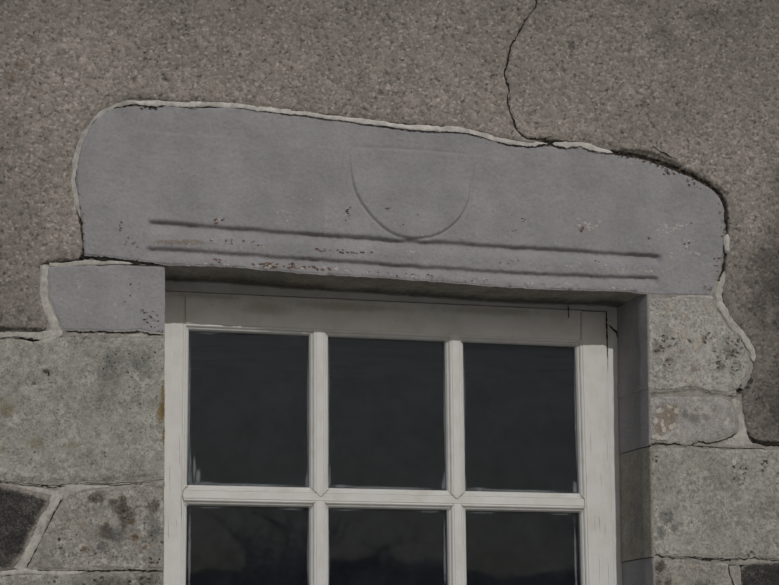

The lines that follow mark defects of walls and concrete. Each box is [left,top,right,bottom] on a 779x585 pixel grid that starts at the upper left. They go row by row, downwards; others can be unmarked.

crack [241,0,729,234]